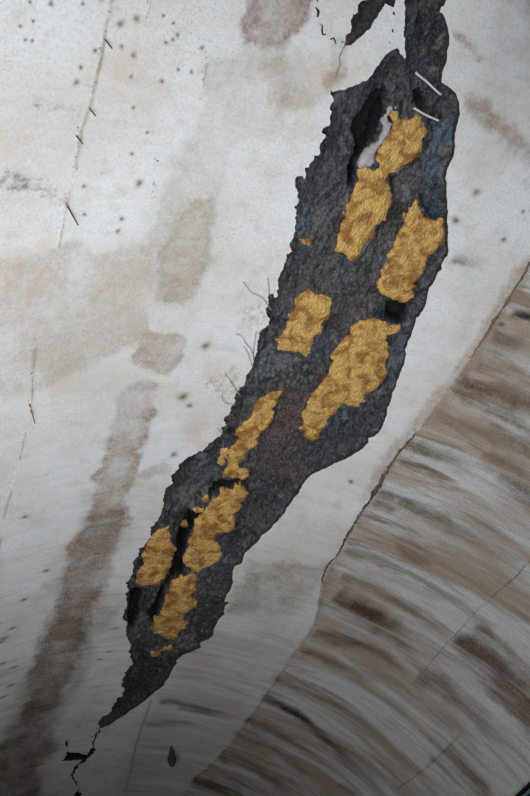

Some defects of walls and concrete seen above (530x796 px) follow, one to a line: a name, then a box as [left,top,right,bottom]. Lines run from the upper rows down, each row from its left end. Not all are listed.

spalling [98,0,460,729]
crack [470,261,530,358]
crack [321,433,416,583]
water stain [0,512,128,796]
crack [65,725,100,785]